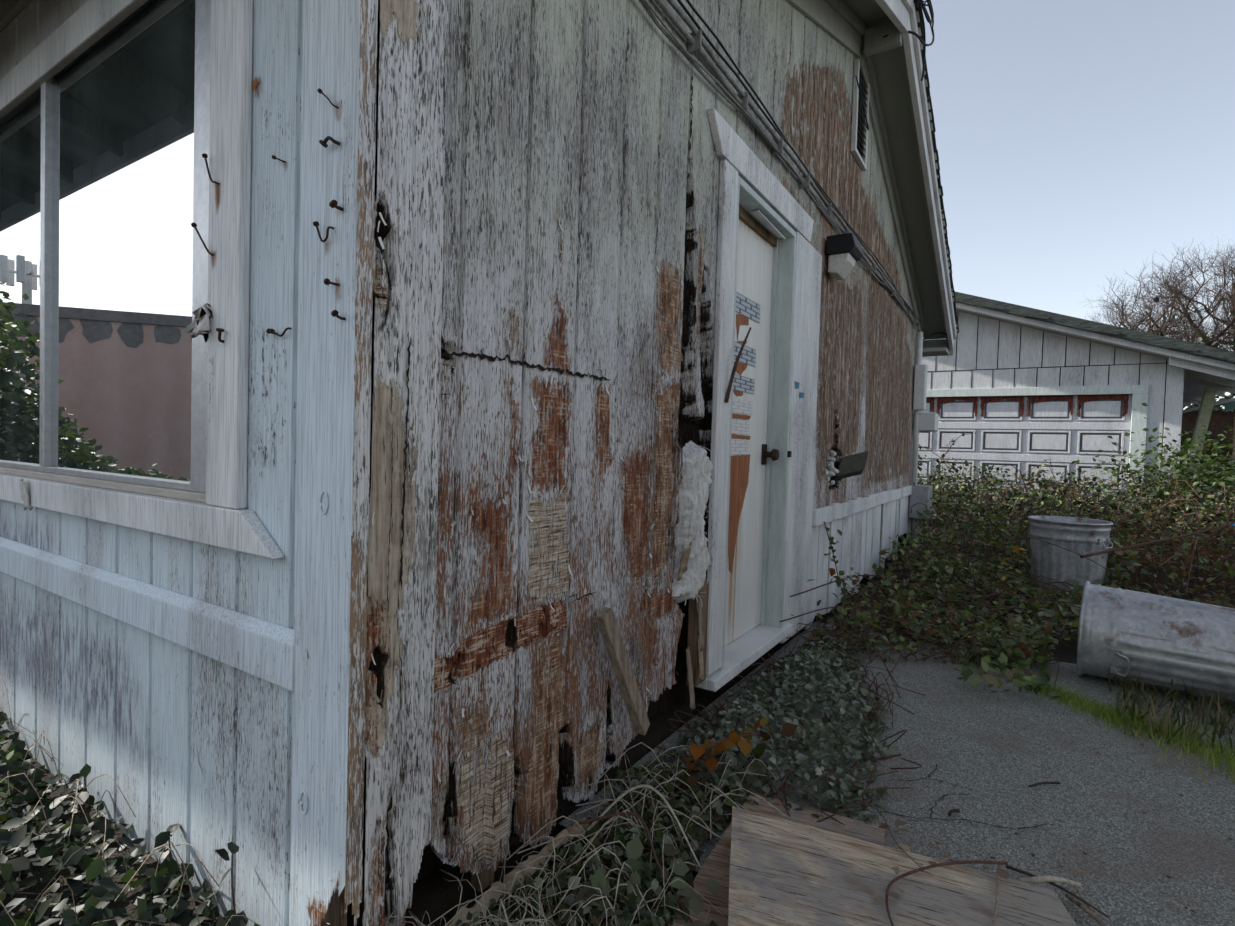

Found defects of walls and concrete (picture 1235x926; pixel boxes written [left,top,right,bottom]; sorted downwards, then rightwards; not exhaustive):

peeling [365,372,419,771]
crack [387,333,411,693]
peeling [437,214,608,840]
crack [440,331,610,395]
peeling [593,221,706,713]
peeling [778,50,911,491]